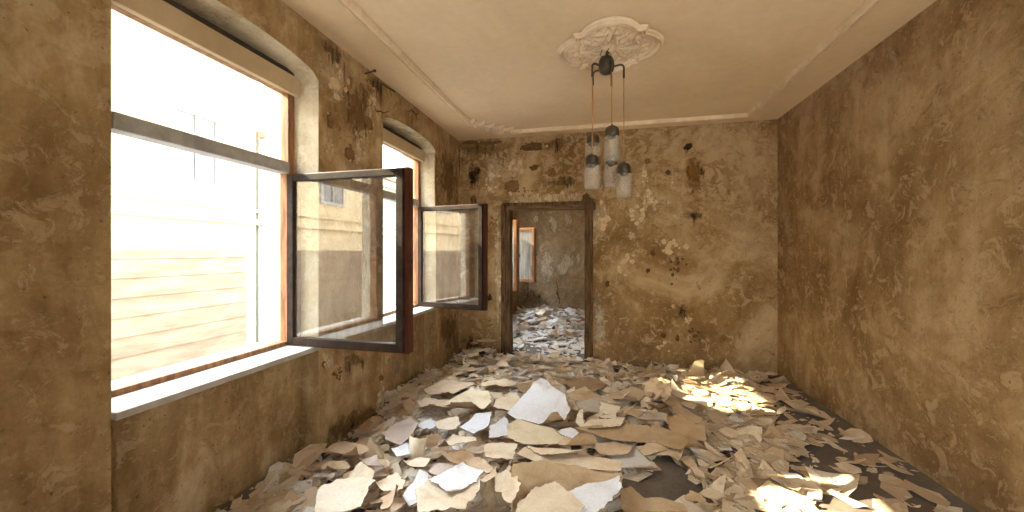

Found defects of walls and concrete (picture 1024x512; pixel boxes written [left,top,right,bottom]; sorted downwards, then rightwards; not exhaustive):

flaking render [317,53,378,168]
flaking render [485,142,611,243]
flaking render [628,158,683,239]
flaking render [646,239,689,285]